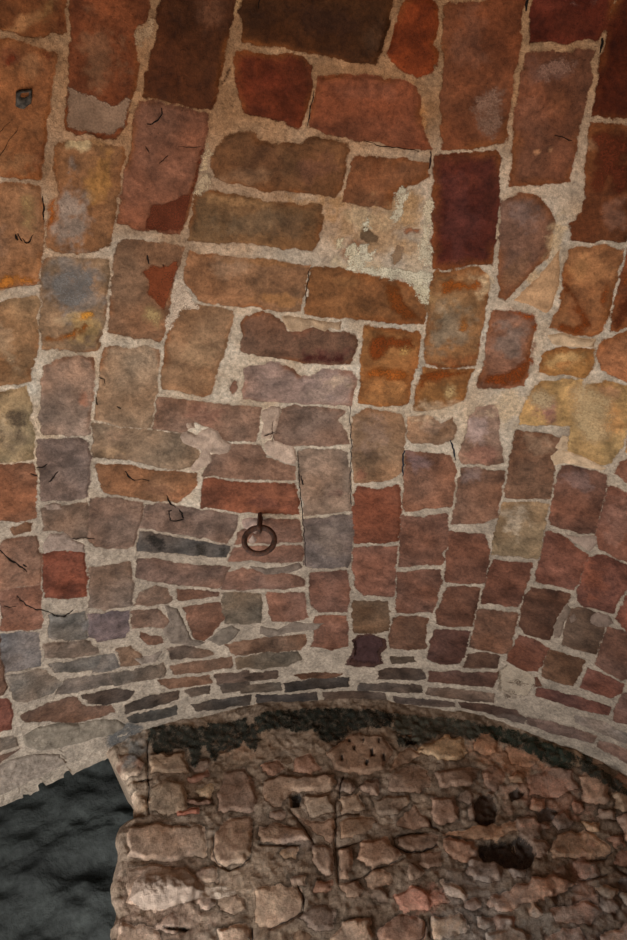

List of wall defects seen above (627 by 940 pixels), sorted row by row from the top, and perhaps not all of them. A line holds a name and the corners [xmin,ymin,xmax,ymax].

crack [167,496,184,522]
crack [0,550,27,572]
crack [5,596,73,617]